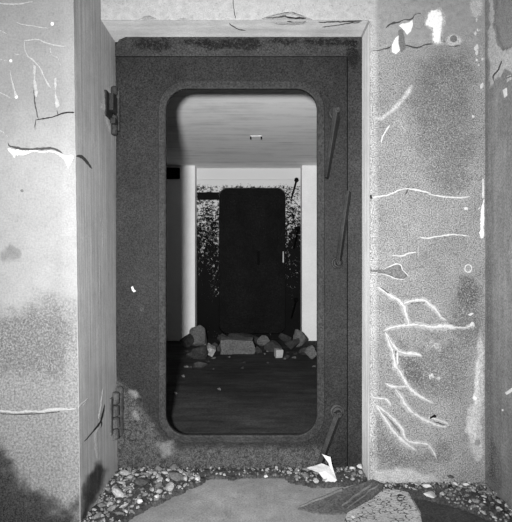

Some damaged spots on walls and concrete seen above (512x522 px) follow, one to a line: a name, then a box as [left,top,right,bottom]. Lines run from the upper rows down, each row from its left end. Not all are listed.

crack [0,22,74,127]
crack [0,130,92,169]
crack [370,187,469,199]
crack [392,234,470,257]
crack [370,286,475,459]
crack [0,390,105,458]